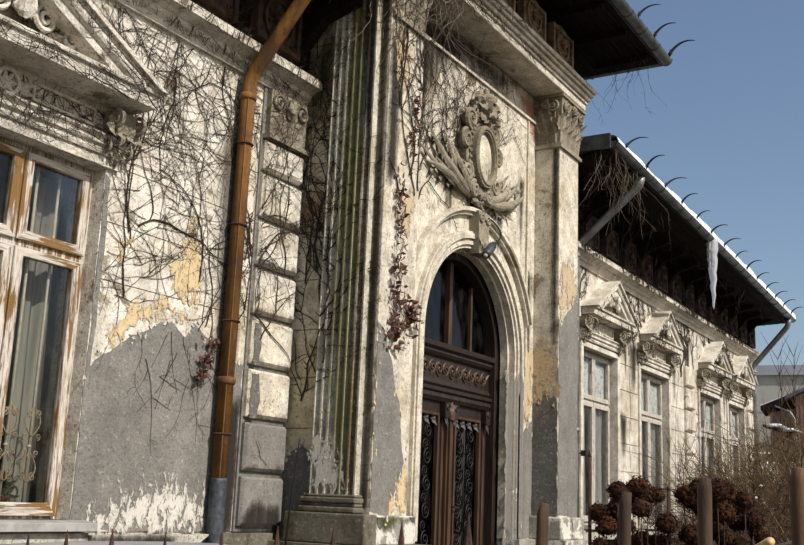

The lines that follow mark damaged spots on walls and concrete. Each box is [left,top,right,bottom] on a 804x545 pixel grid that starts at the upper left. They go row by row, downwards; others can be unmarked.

flaking render [69,174,220,535]
flaking render [502,261,579,545]